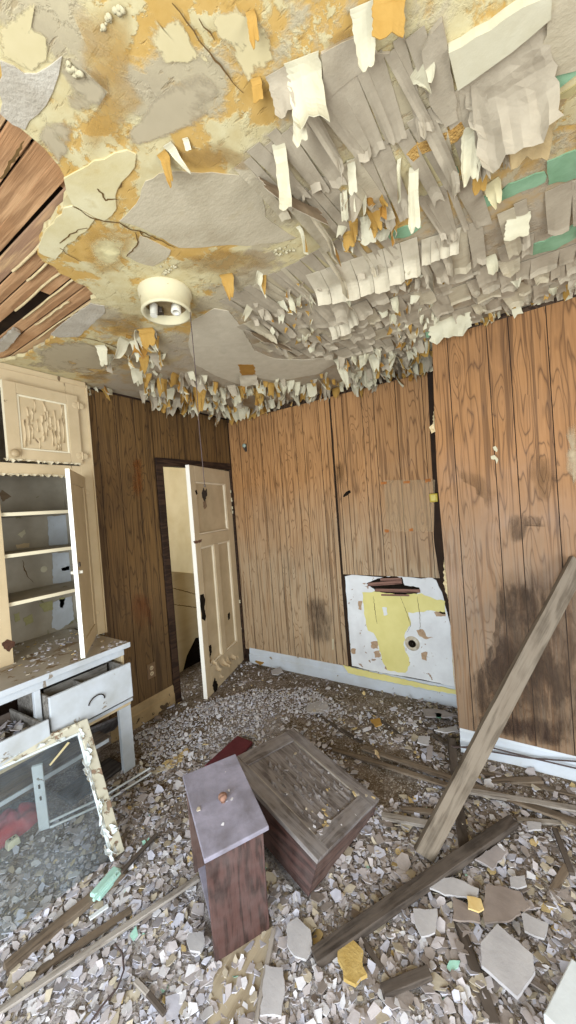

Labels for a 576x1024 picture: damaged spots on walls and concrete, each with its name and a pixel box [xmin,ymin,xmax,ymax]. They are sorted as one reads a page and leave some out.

crack [60,183,175,262]
flaking render [0,0,576,425]
flaking render [345,575,456,687]
damp [479,592,543,707]
damp [504,627,574,743]